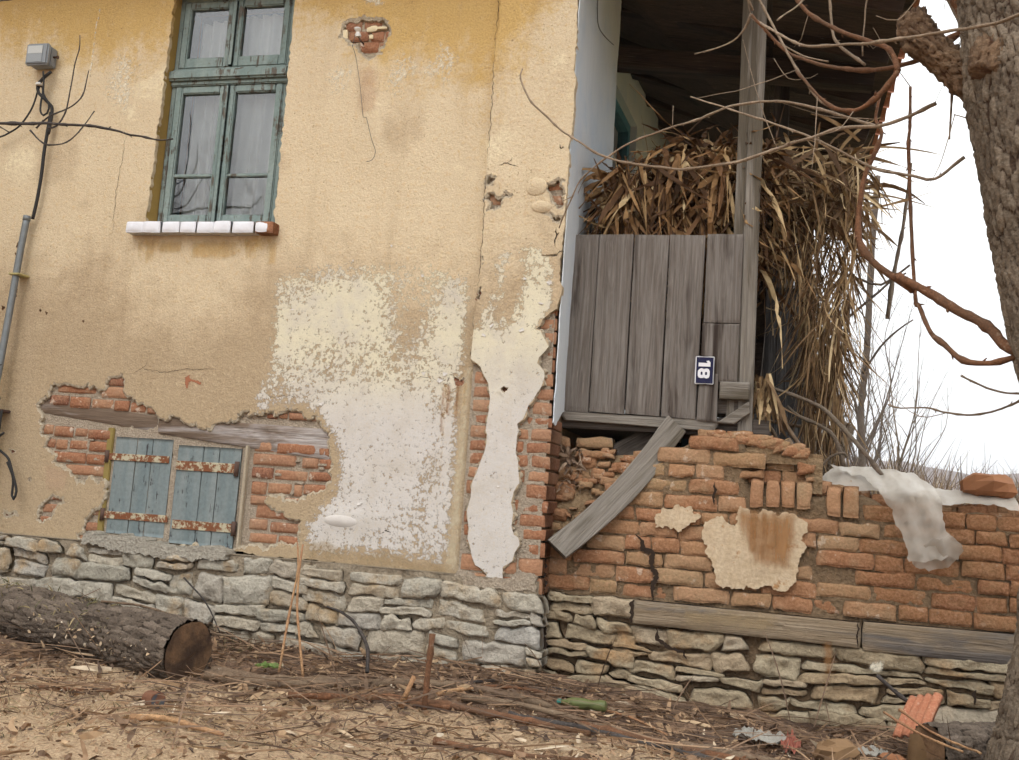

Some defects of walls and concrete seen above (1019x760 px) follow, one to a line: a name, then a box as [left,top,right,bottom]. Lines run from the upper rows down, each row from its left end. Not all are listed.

flaking render [338,14,392,61]
peeling [35,244,564,594]
crack [629,534,659,623]
crack [655,628,687,659]